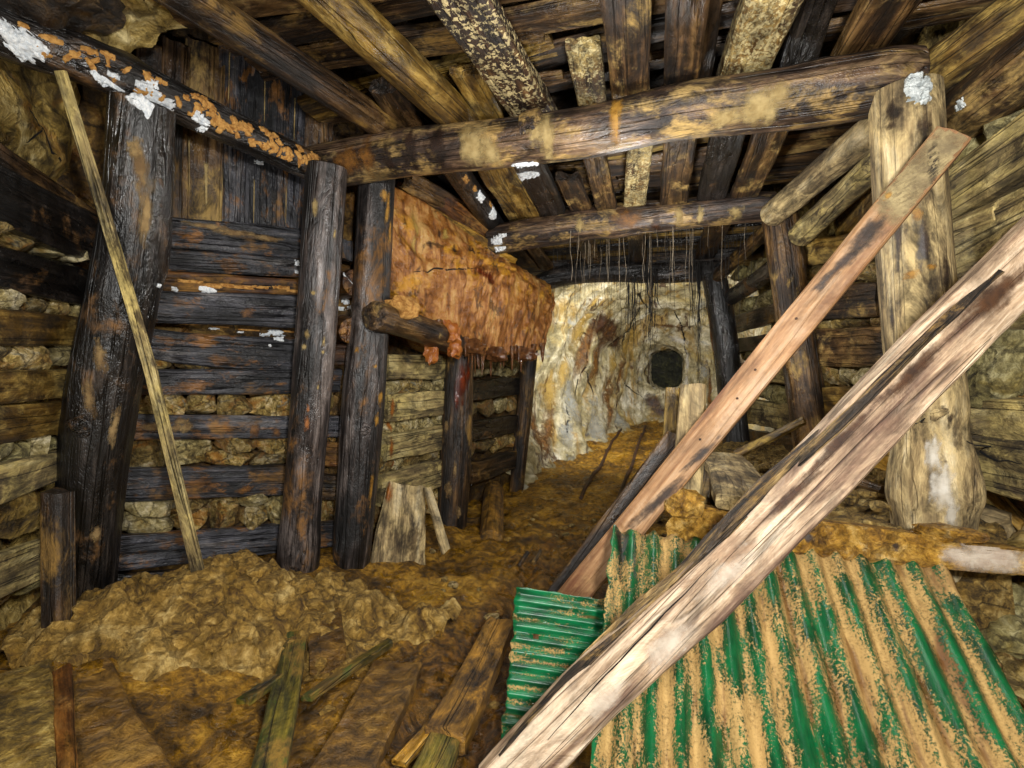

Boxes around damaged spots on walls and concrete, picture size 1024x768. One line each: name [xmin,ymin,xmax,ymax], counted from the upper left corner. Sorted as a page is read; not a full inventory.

leakage [886,71,933,128]
leakage [917,118,938,180]